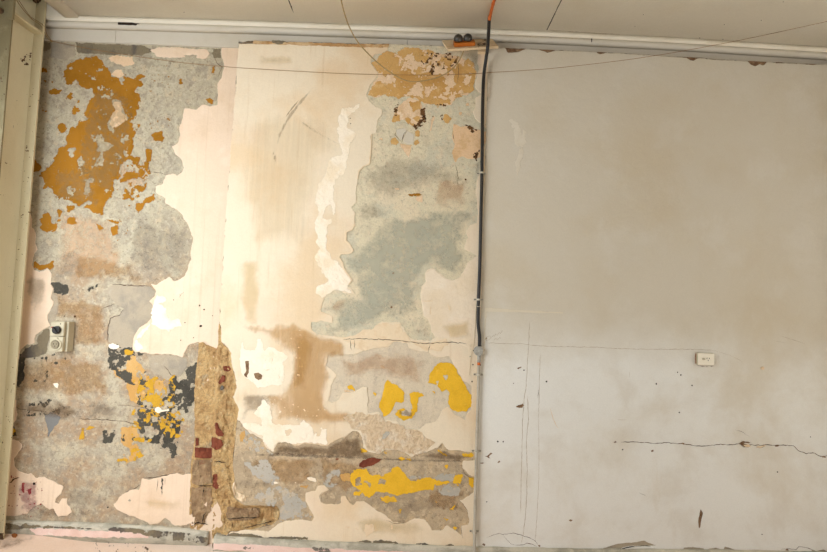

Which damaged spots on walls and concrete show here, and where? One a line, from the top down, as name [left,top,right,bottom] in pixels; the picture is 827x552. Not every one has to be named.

peeling [6,40,492,540]
crack [492,322,731,547]
crack [627,430,826,458]